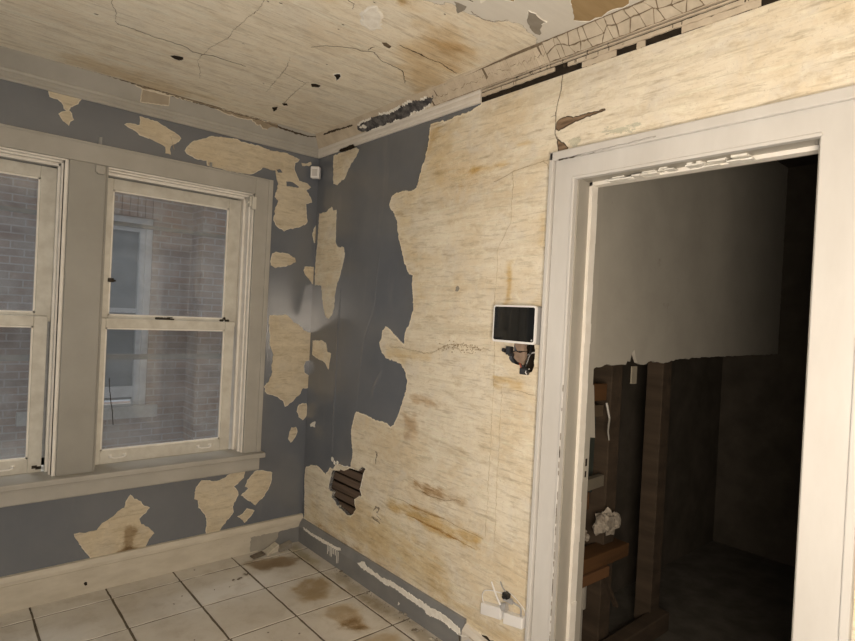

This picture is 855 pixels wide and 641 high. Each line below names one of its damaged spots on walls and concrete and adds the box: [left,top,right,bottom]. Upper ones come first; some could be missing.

crack [111,1,264,75]
peeling [48,91,82,125]
crack [99,73,353,137]
crack [317,0,762,306]
peeling [124,116,345,319]
peeling [303,0,855,641]
peeling [264,314,331,442]
peeling [74,495,154,558]
peeling [194,470,272,534]